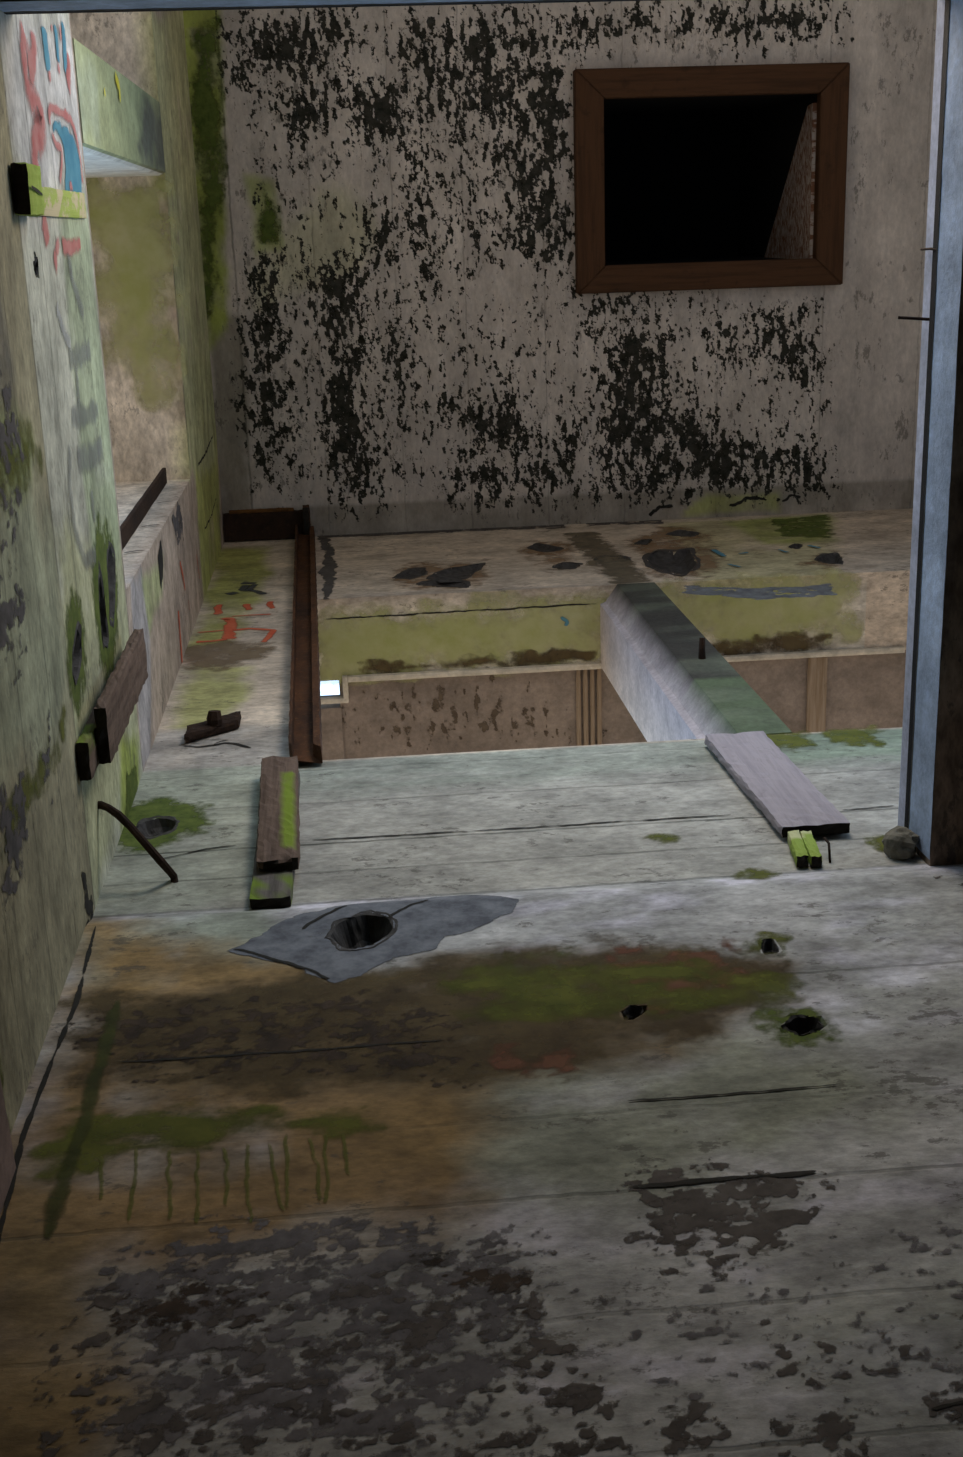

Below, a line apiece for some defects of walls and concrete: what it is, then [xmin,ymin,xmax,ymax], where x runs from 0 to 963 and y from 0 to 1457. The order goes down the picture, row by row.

peeling [0,370,30,684]
spalling [317,520,844,600]
peeling [227,895,519,983]
leakage [58,936,791,1097]
peeling [33,1216,633,1457]
peeling [617,1155,963,1429]
peeling [644,1362,731,1456]
peeling [750,1397,874,1457]
crack [932,1401,963,1410]